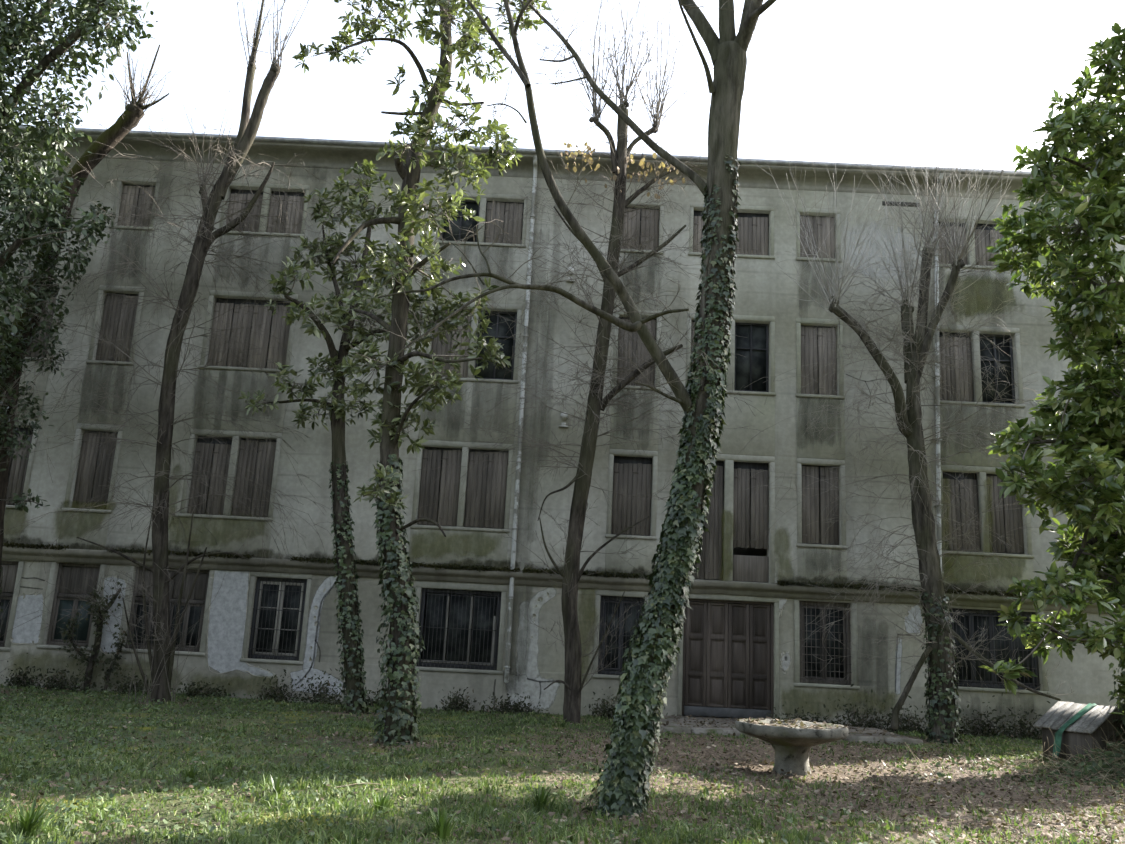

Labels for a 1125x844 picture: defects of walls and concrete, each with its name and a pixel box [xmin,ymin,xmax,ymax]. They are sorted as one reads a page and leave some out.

flaking render [10,592,45,645]
flaking render [100,575,129,655]
flaking render [206,570,343,695]
flaking render [507,587,560,709]